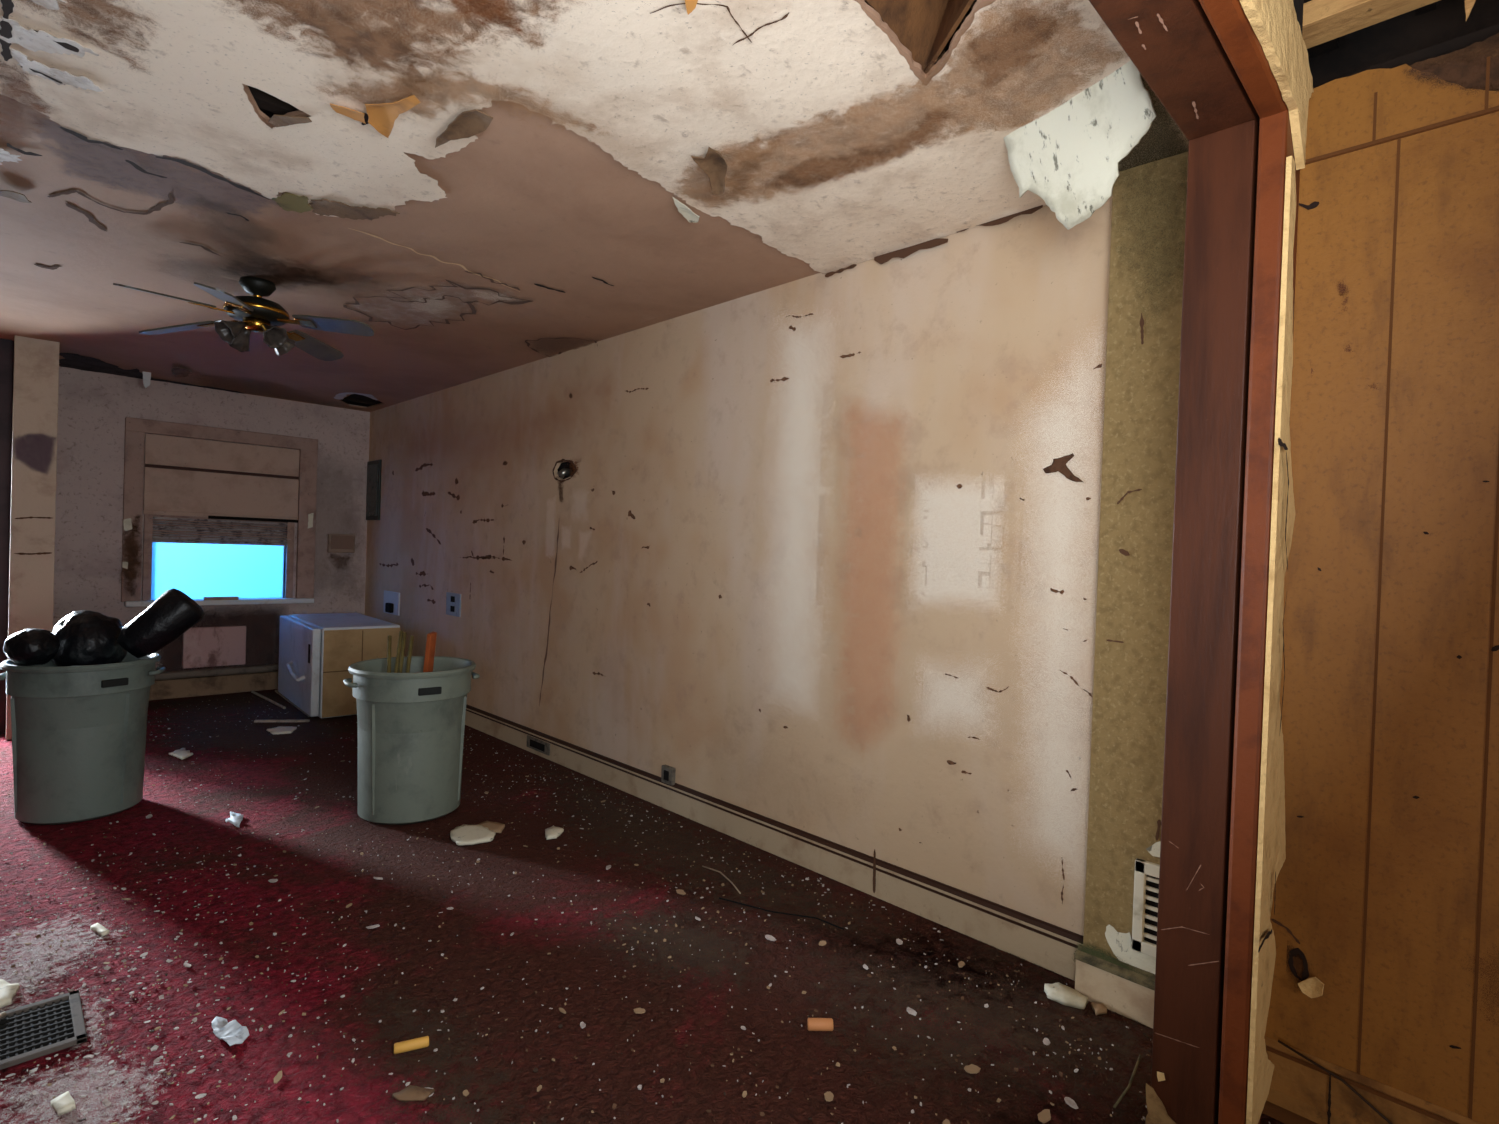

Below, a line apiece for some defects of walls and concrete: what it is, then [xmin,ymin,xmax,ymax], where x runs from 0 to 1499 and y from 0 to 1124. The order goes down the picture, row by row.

water stain [13,0,167,75]
water stain [216,0,614,137]
flaking render [0,0,1131,277]
water stain [669,0,1129,210]
flaking render [1118,76,1189,170]
water stain [1404,53,1499,95]
peeling [142,371,151,388]
peeling [1146,820,1161,857]